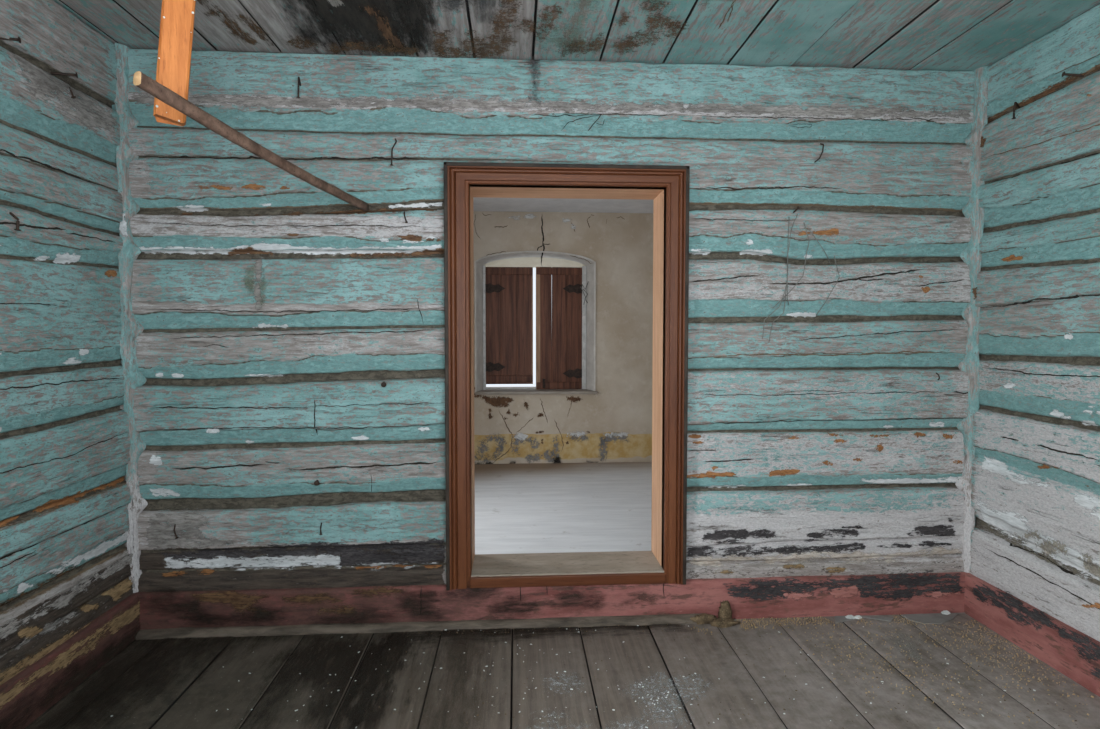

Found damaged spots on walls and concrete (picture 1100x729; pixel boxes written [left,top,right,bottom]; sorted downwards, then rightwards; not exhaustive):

leakage [197,0,563,58]
leakage [555,0,689,57]
crack [537,215,624,265]
flaking render [474,387,544,420]
crack [493,399,572,463]
peeling [1049,406,1100,426]
peeling [33,476,124,512]
peeling [861,460,963,484]
peeling [981,455,1048,487]
peeling [975,495,1100,581]
peeling [0,508,445,710]
peeling [686,518,1100,679]